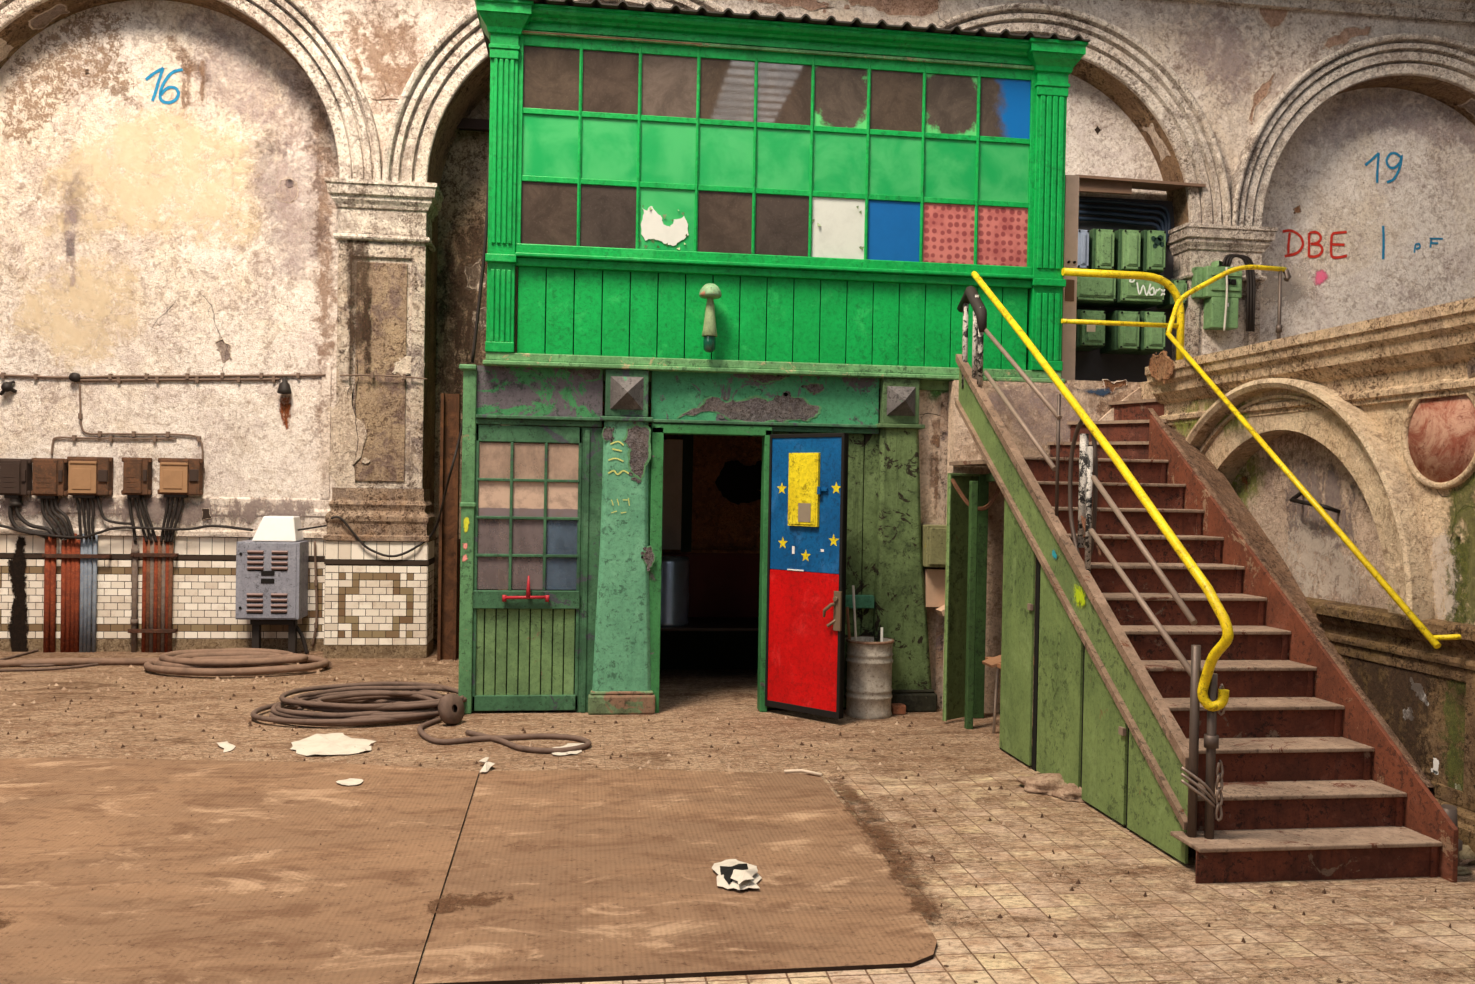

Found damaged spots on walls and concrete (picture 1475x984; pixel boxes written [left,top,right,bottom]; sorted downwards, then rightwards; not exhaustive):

damp [46,36,260,240]
peeling [558,368,603,382]
peeling [677,374,825,422]
spalling [1467,356,1475,378]
damp [1429,472,1475,624]